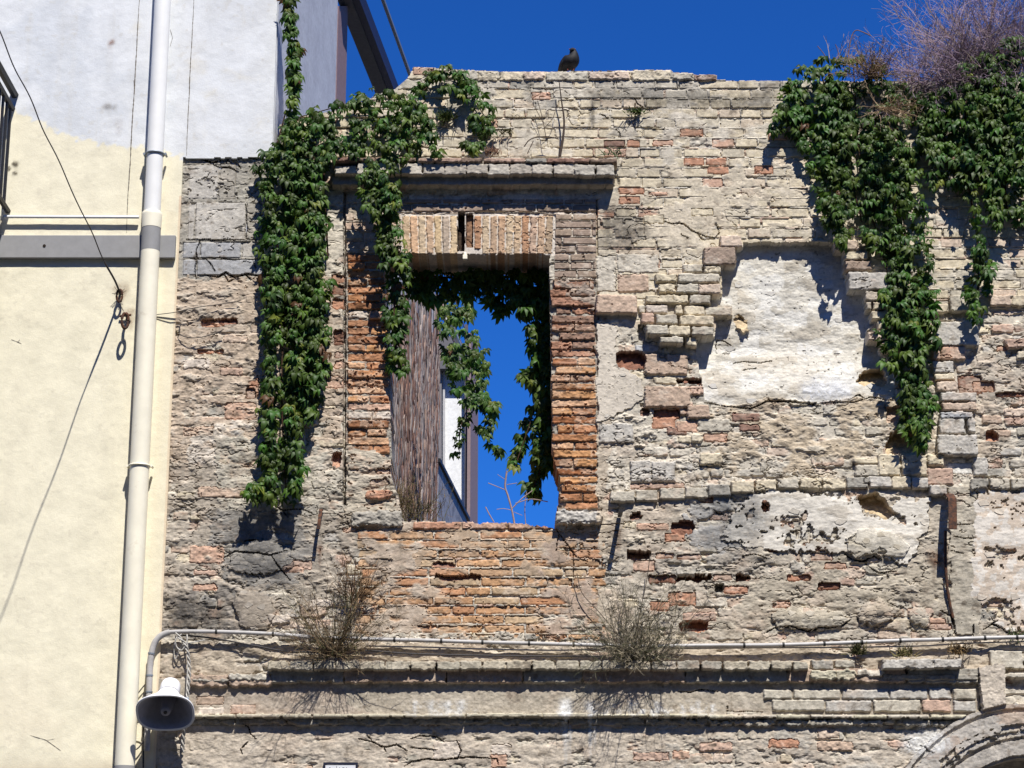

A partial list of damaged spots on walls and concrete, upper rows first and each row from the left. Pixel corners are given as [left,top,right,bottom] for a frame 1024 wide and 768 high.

flaking render [677,241,924,455]
crack [219,539,290,580]
spalling [432,560,482,583]
flaking render [722,488,931,564]
flaking render [970,486,1024,632]
crack [361,736,499,766]